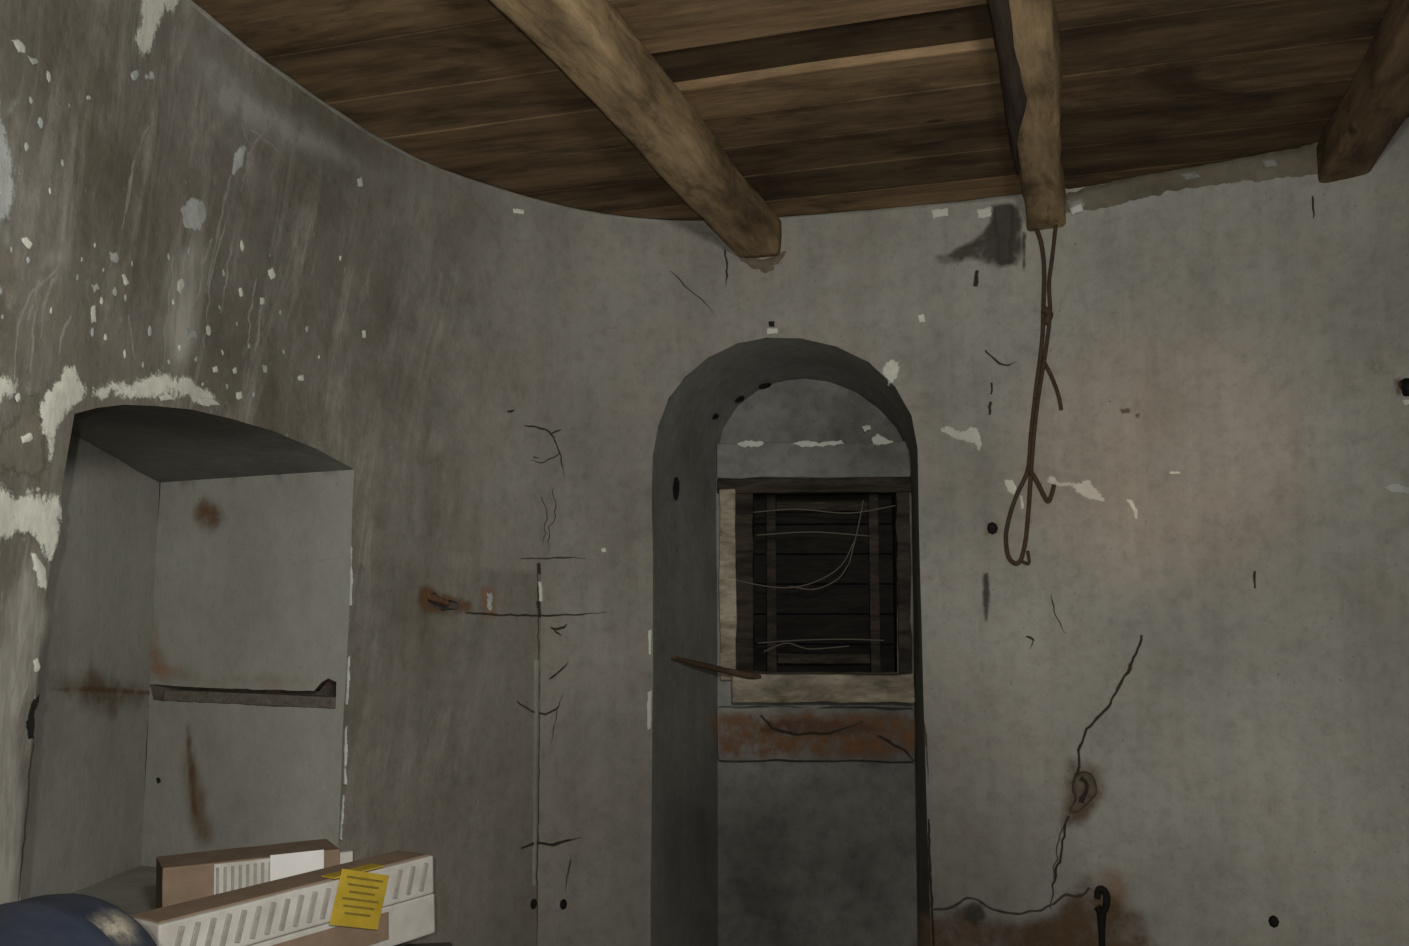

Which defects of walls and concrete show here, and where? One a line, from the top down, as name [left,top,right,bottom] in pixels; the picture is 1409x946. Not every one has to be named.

peeling [131,0,178,81]
peeling [0,97,43,263]
leakage [993,205,1026,268]
peeling [21,198,255,462]
peeling [0,375,21,404]
spalling [1397,378,1409,405]
peeling [940,426,982,452]
peeling [1005,479,1024,509]
peeling [1047,476,1107,503]
peeling [0,485,62,904]
crack [1077,635,1142,775]
crack [1050,816,1069,908]